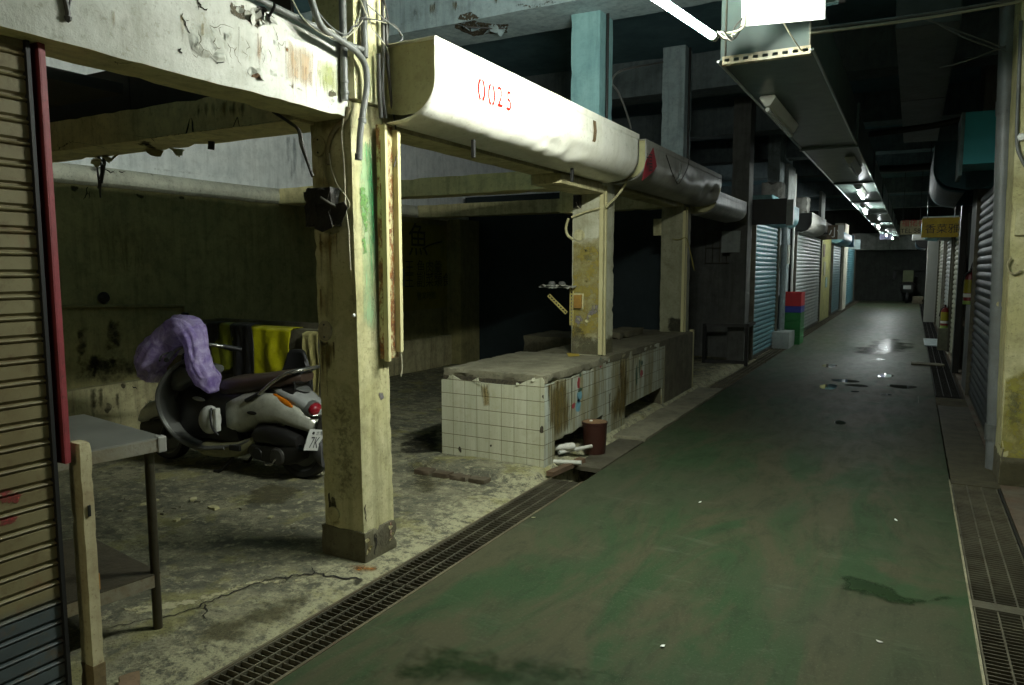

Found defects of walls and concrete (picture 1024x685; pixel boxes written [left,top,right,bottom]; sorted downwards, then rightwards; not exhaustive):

peeling [230,2,277,29]
spalling [455,12,508,36]
leakage [78,332,136,407]
crack [110,567,361,628]
leakage [843,576,923,604]